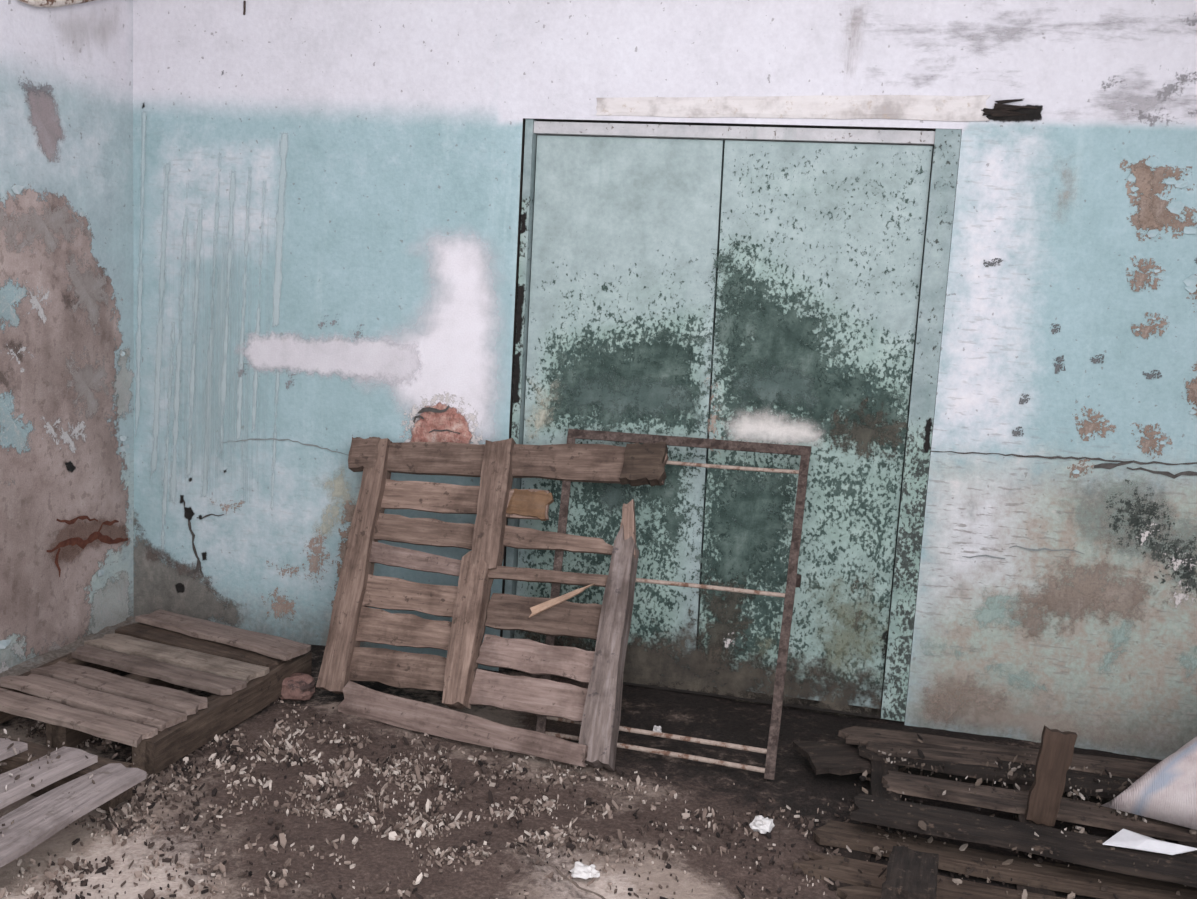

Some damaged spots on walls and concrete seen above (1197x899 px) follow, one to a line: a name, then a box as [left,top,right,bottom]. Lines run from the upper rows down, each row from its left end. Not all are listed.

peeling [18,79,65,162]
peeling [1120,156,1197,241]
peeling [1126,256,1166,292]
peeling [1131,313,1170,340]
damp [133,111,288,626]
peeling [0,184,134,673]
spalling [395,393,483,445]
crack [930,451,1197,479]
peeling [1072,406,1116,441]
peeling [1131,423,1173,460]
crack [180,478,224,577]
damp [1104,479,1197,608]